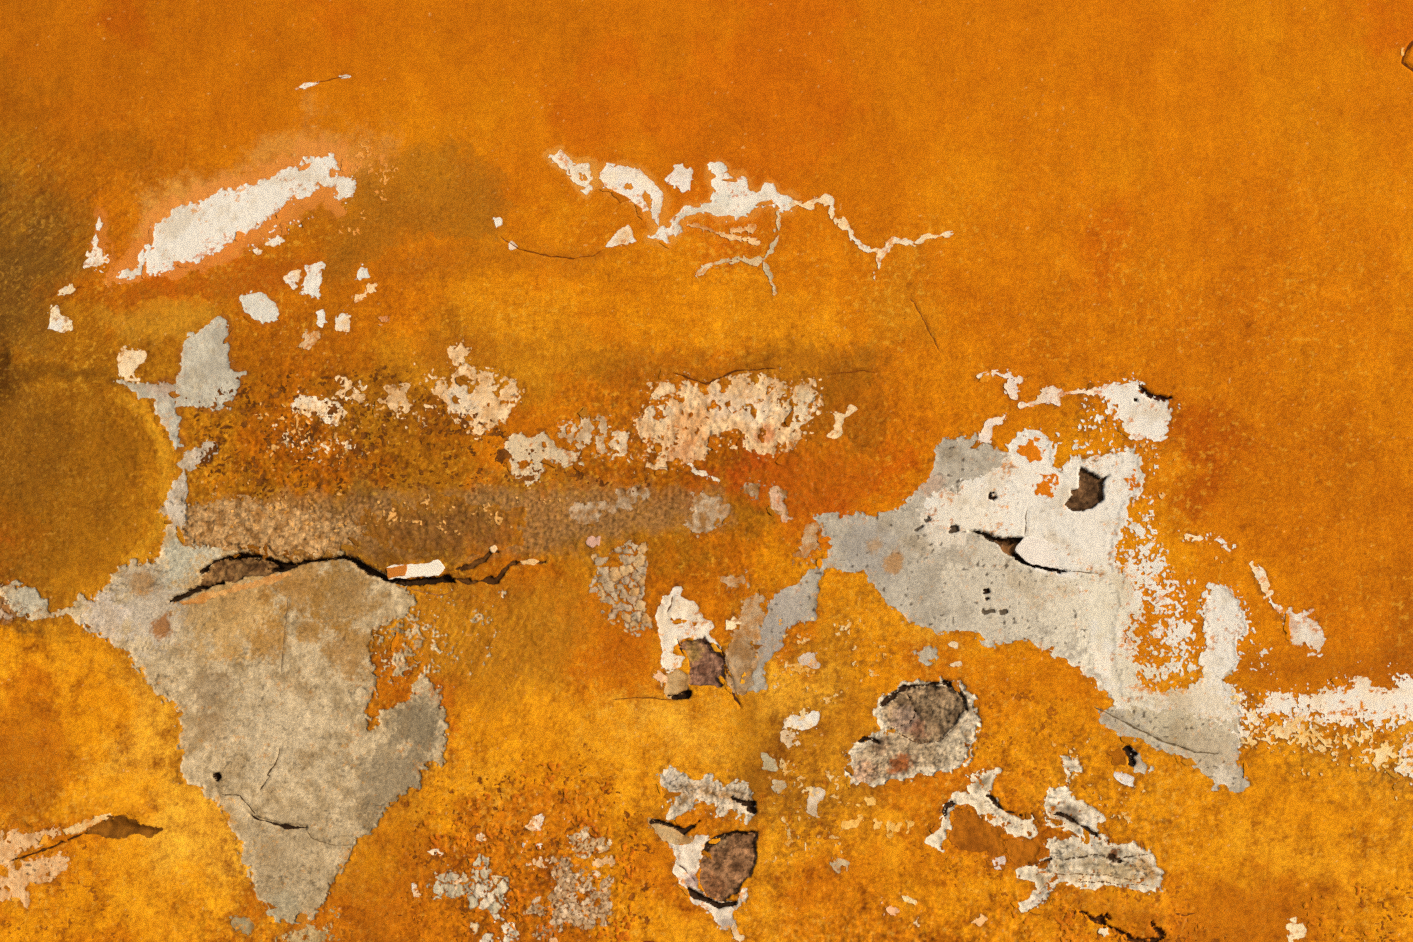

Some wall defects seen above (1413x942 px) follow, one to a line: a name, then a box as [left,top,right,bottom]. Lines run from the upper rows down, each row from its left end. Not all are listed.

crack [1401,41,1413,71]
peeling [83,135,414,287]
peeling [493,150,954,295]
crack [170,545,546,605]
flaking render [0,261,1413,942]